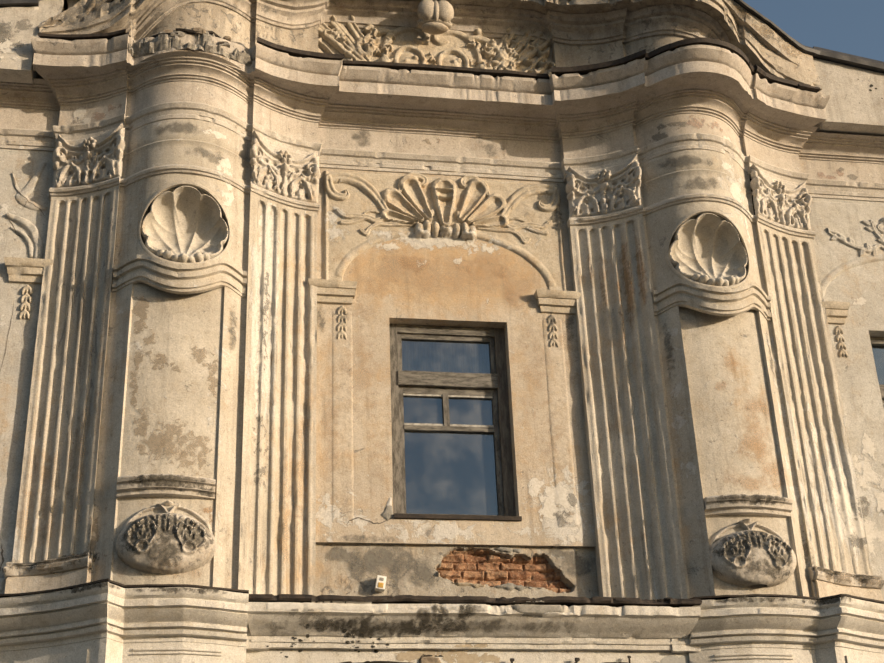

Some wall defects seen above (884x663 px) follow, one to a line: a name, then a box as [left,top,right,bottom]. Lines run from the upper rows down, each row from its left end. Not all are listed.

flaking render [0,27,18,60]
spalling [129,27,253,67]
peeling [803,401,884,556]
spalling [346,497,393,525]
peeling [528,477,586,543]
spalling [266,601,399,613]
leakage [280,604,502,658]
spalling [410,546,573,618]